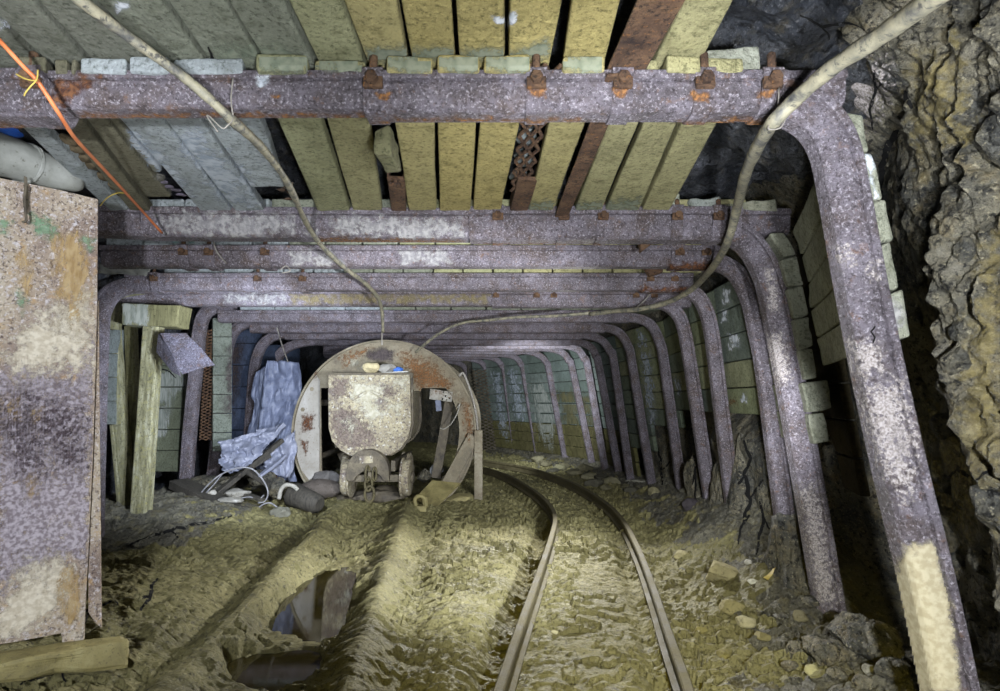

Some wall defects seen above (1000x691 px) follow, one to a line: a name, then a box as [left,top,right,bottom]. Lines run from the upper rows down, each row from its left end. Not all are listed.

rust [690,91,709,101]
crack [737,440,770,555]